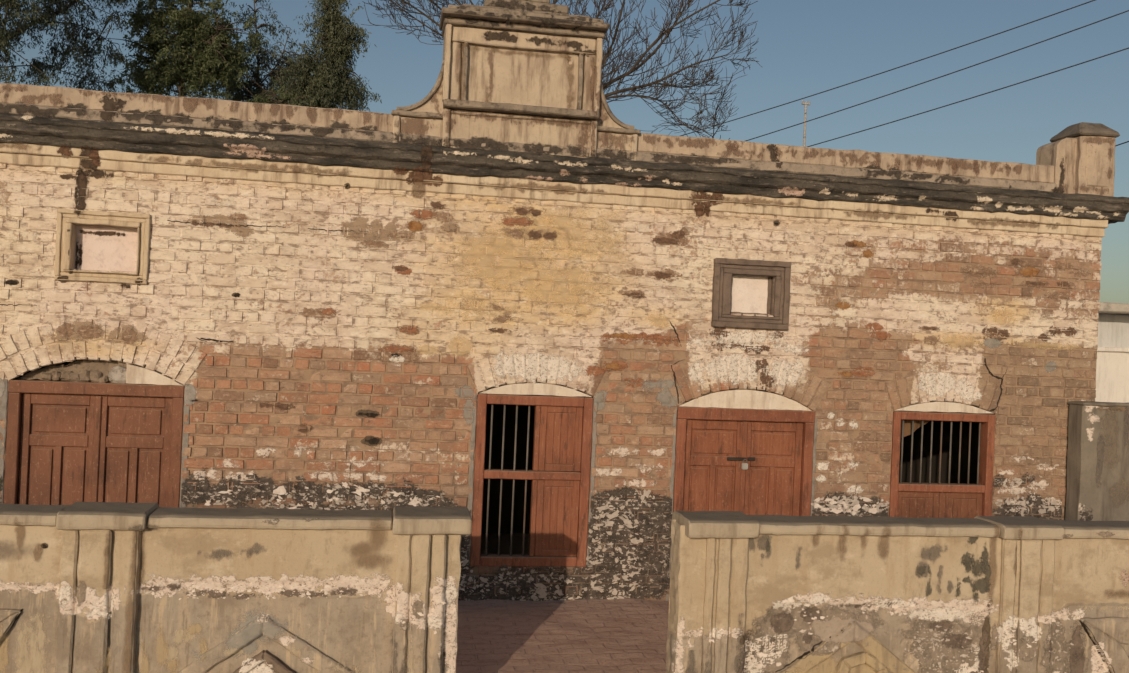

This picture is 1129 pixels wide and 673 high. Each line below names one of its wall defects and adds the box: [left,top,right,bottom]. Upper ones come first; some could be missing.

damp [99,93,127,122]
peeling [124,126,348,188]
damp [766,144,783,169]
damp [57,145,125,283]
flaking render [967,196,1121,229]
peeling [601,325,809,392]
crack [984,358,1008,411]
damp [749,535,771,558]
damp [793,454,1062,625]
peeling [382,575,458,673]
flaking render [684,594,884,673]
flaking render [902,604,1112,673]